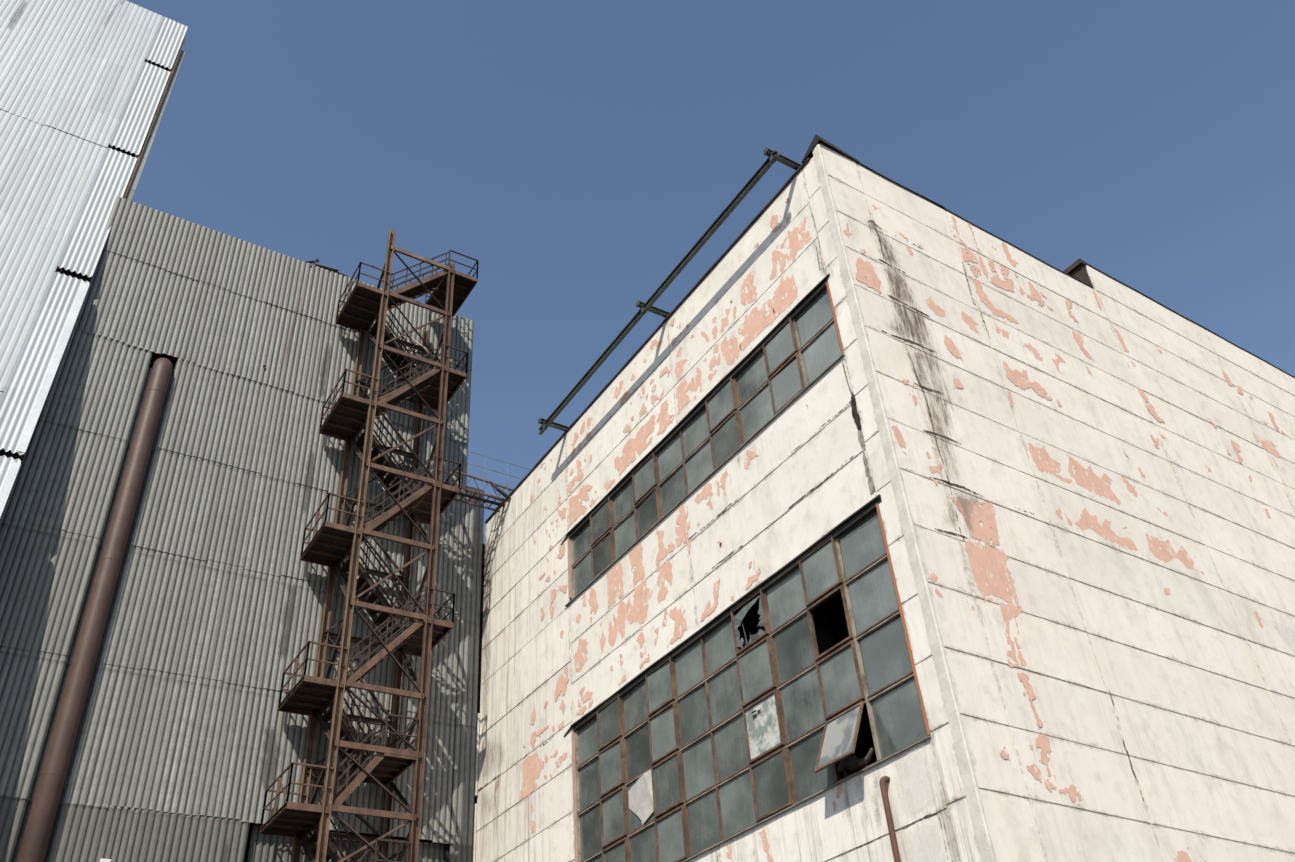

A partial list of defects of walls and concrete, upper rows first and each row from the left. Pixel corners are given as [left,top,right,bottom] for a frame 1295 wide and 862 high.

peeling [843,223,881,293]
water stain [869,224,937,378]
peeling [952,216,1102,378]
peeling [944,335,963,361]
peeling [1000,343,1066,407]
spalling [851,394,875,494]
peeling [1027,443,1145,505]
peeling [1137,388,1166,449]
peeling [1252,411,1285,467]
peeling [520,198,812,834]
peeling [1055,507,1205,575]
peeling [951,496,1083,806]